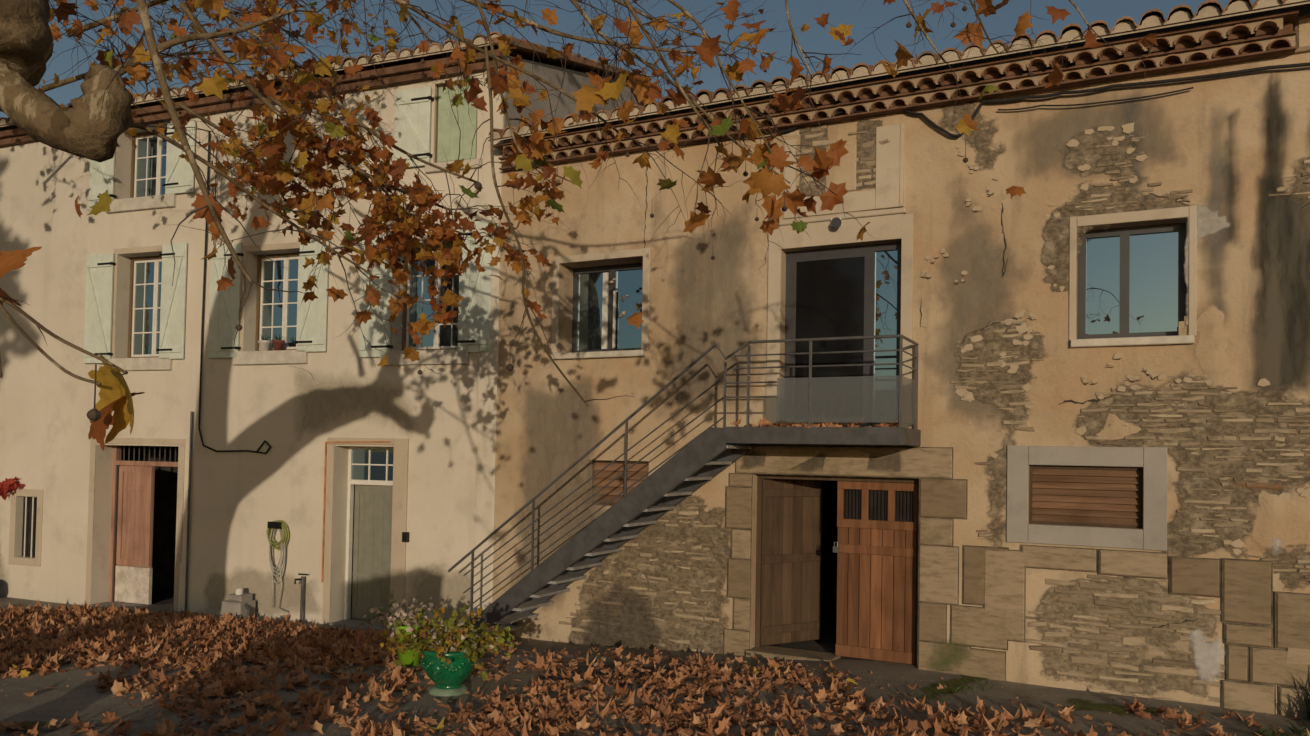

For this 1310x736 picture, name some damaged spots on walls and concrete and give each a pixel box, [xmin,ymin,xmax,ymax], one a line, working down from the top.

peeling [1041,123,1193,292]
water stain [1255,95,1310,391]
peeling [950,309,1055,547]
peeling [1073,352,1310,589]